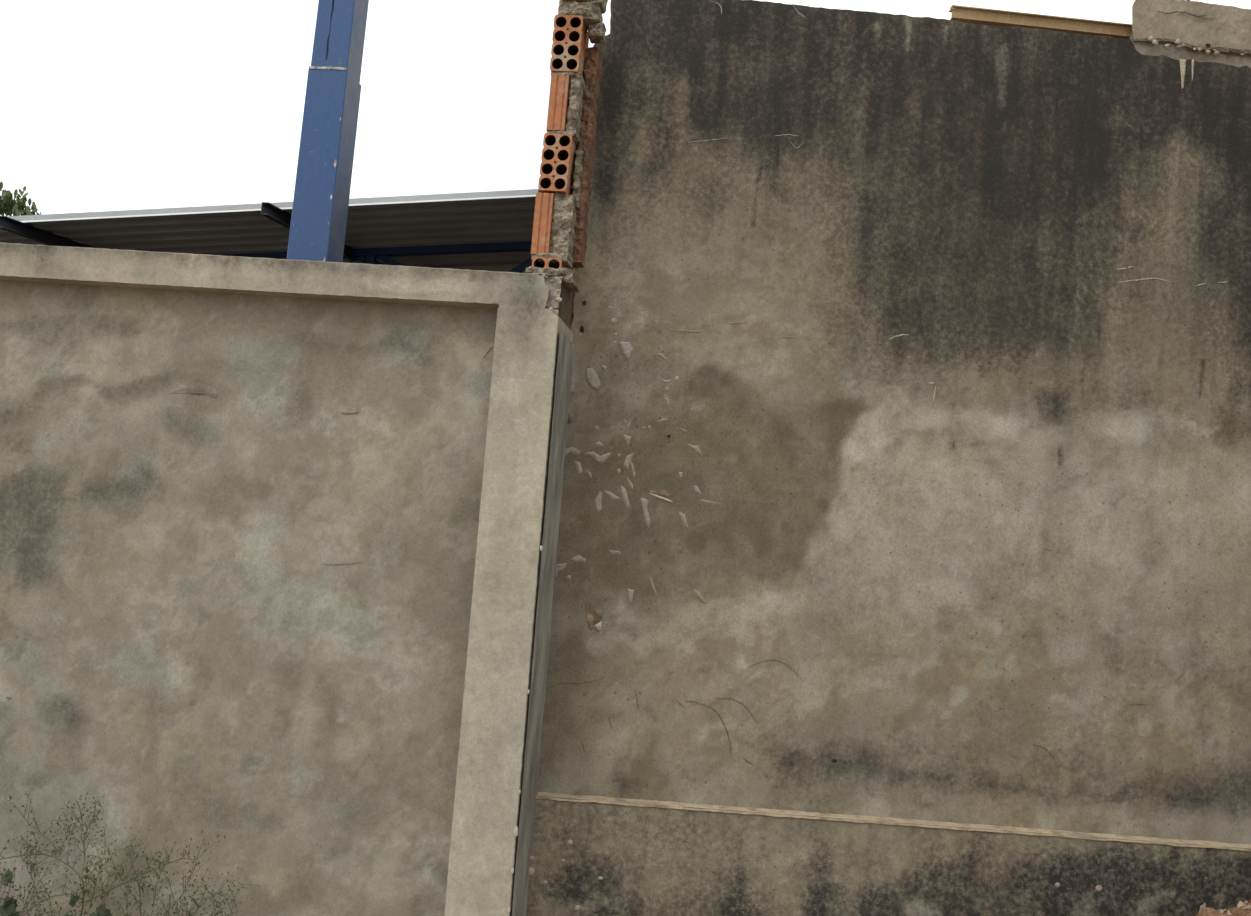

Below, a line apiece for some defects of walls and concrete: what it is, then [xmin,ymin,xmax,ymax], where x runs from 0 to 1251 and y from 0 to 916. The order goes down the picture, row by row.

spalling [542,47,603,316]
peeling [565,376,688,529]
damp [512,0,1251,916]